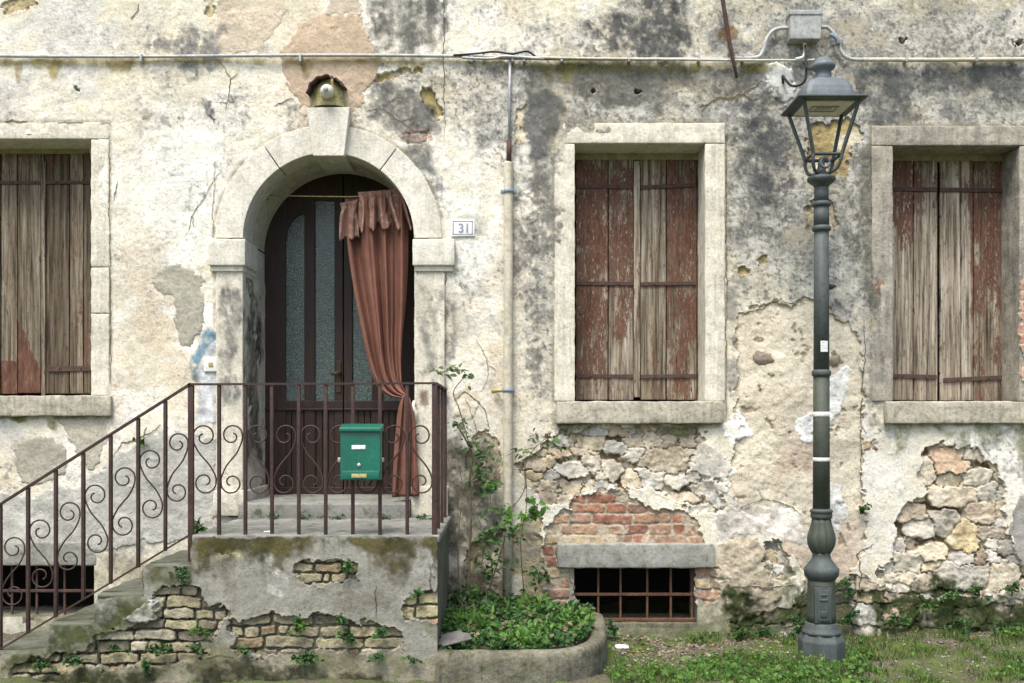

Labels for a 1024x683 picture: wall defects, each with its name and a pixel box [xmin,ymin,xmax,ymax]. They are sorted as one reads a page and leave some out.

flaking render [400,88,444,147]
crack [700,80,762,112]
flaking render [804,117,863,177]
crack [189,165,219,234]
flaking render [729,297,814,583]
flaking render [829,307,878,582]
flaking render [294,559,358,587]
flaking render [464,486,704,609]
flaking render [693,567,720,605]
flaking render [11,584,404,680]